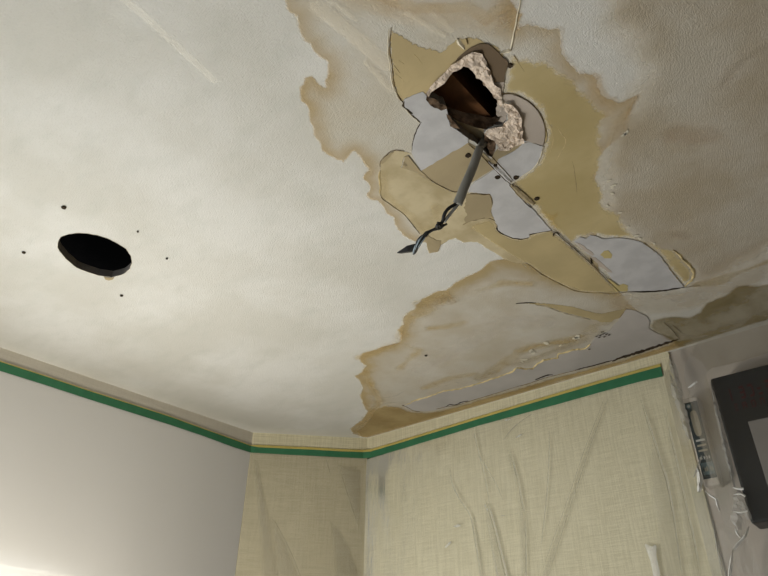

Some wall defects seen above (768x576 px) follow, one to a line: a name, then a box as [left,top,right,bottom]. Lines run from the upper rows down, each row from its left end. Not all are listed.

crack [510,0,521,49]
peeling [402,38,551,239]
water stain [286,0,768,280]
water stain [351,259,768,437]
peeling [574,235,684,292]